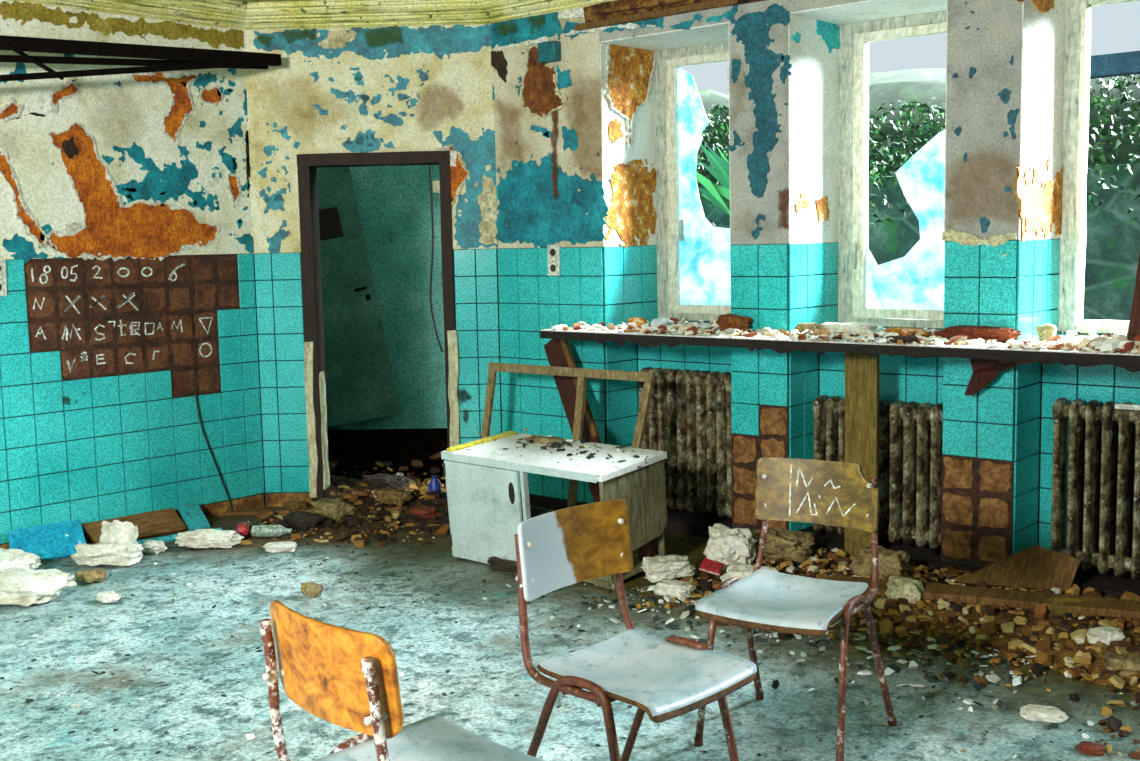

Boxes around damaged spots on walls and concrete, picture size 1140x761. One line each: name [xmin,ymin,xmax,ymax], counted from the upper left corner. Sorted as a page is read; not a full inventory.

peeling [0,68,300,398]
peeling [0,0,801,249]
spalling [794,192,830,222]
peeling [815,20,840,53]